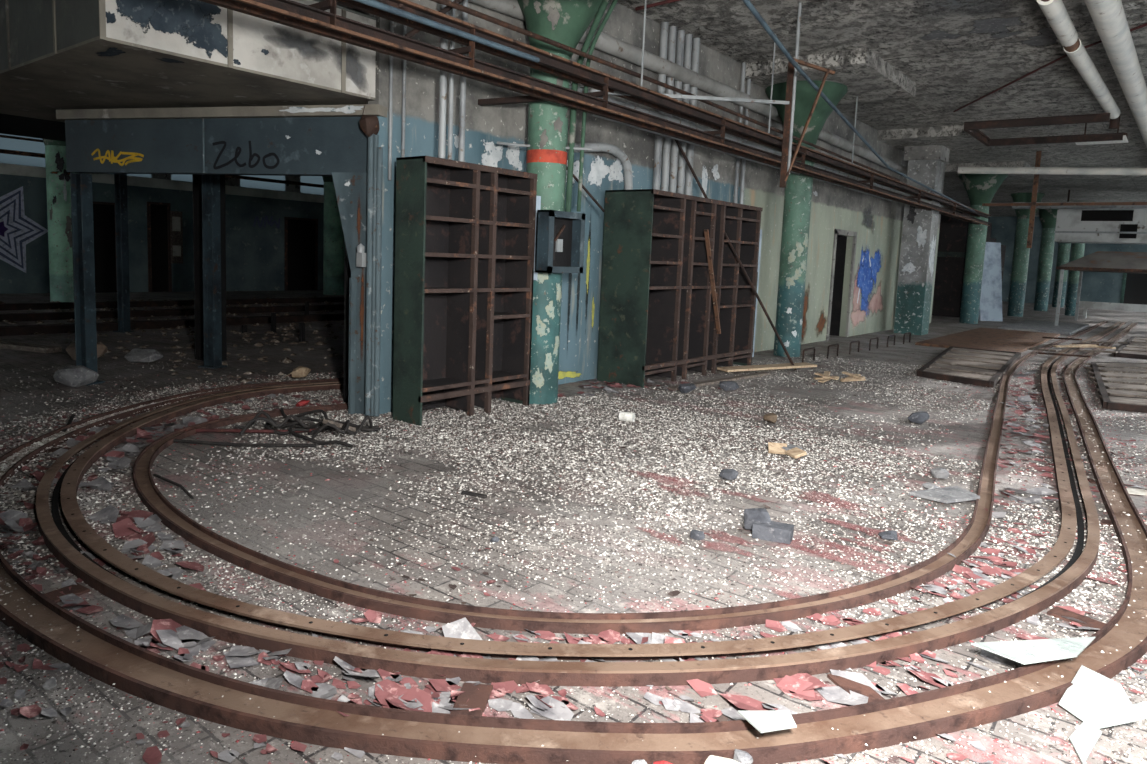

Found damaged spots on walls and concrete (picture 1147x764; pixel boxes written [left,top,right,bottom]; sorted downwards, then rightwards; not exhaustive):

peeling [106,0,241,65]
peeling [534,1,560,30]
peeling [482,139,522,171]
peeling [566,156,624,187]
peeling [586,239,595,328]
peeling [532,272,581,388]